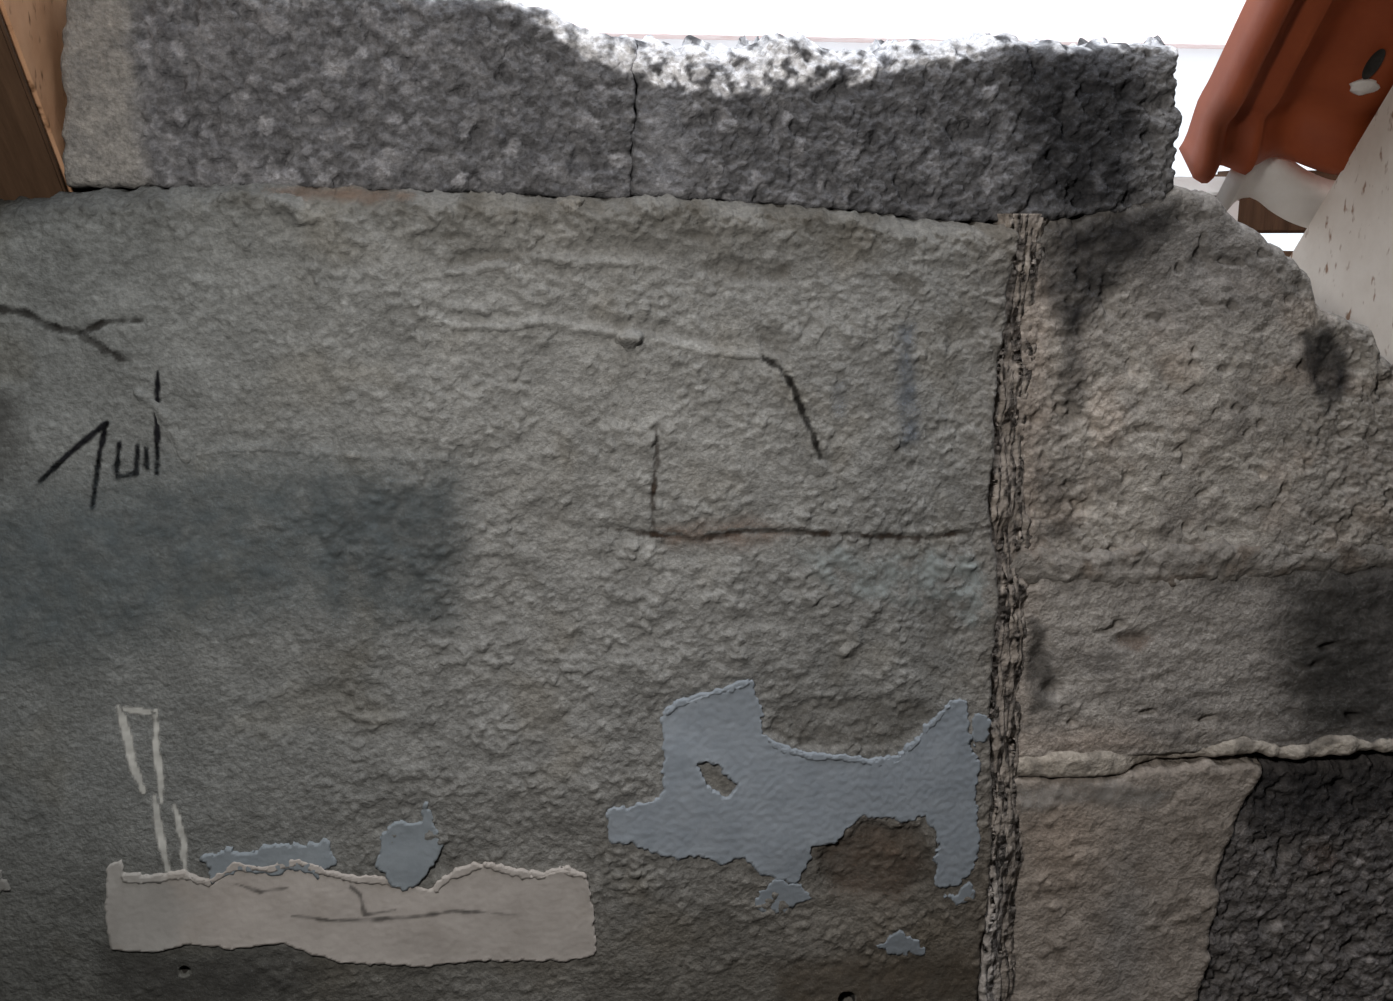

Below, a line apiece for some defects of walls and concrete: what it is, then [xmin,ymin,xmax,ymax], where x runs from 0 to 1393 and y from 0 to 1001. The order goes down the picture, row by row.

crack [762,356,821,459]
crack [636,446,670,538]
crack [706,526,991,541]
peeling [605,679,992,914]
flaking render [104,801,597,968]
peeling [876,930,926,956]